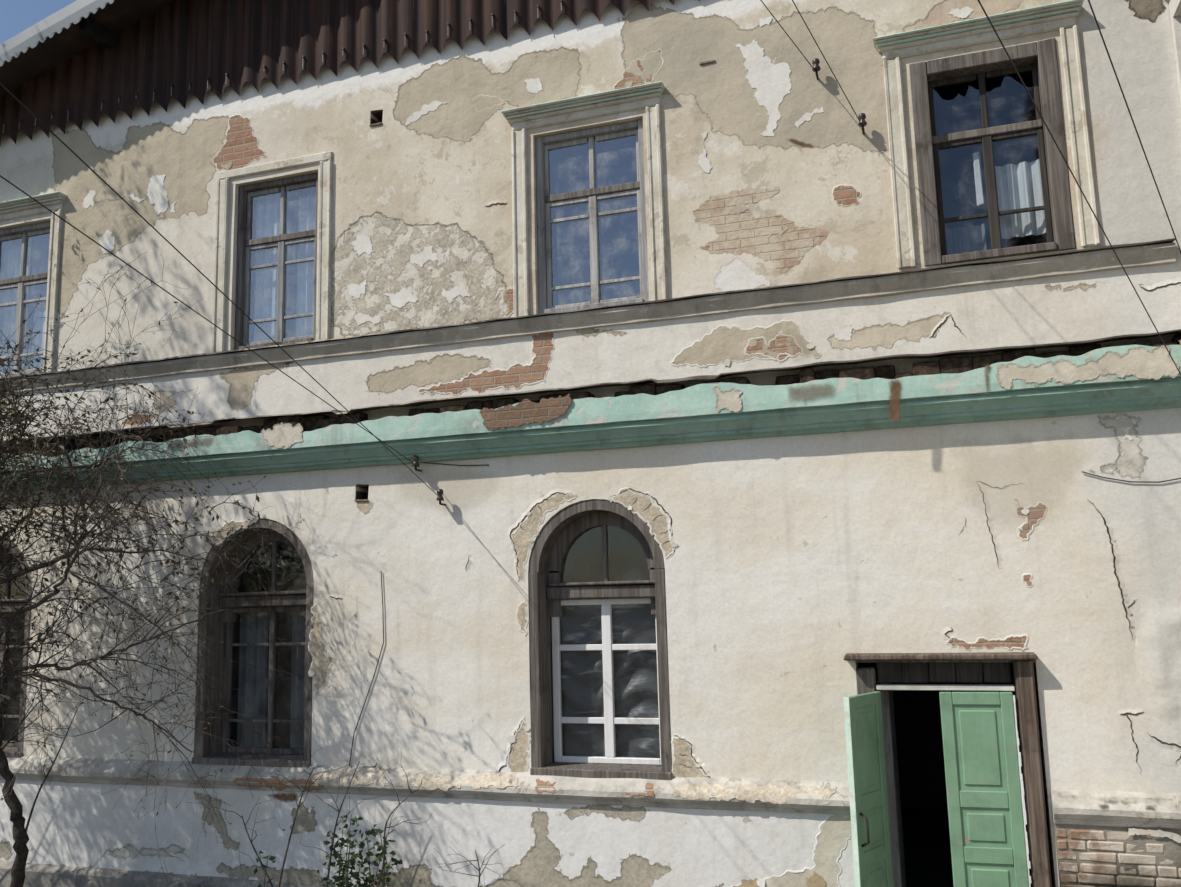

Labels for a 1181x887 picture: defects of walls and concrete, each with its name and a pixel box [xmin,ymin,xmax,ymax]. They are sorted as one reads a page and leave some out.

spalling [1124,0,1166,23]
flaking render [392,46,581,143]
flaking render [51,114,267,319]
flaking render [331,211,514,338]
flaking render [693,187,828,274]
flaking render [365,332,571,430]
crack [959,481,1022,569]
crack [1088,497,1136,641]
spalling [233,718,556,835]
peeling [479,783,672,887]
spalling [671,737,852,887]
crack [1119,708,1181,774]